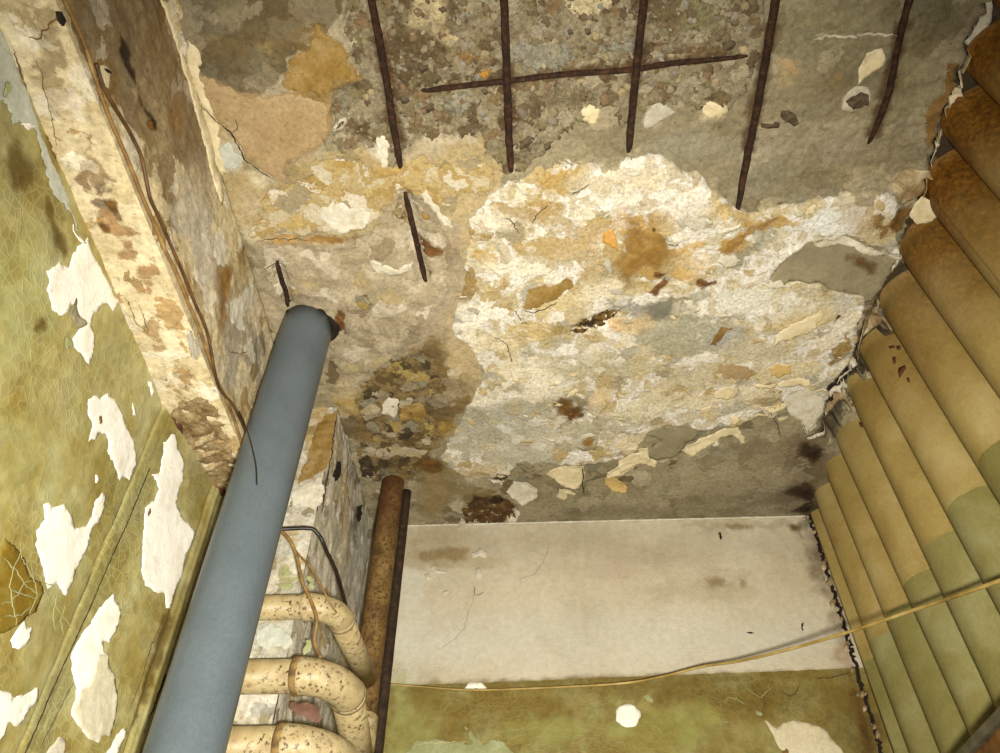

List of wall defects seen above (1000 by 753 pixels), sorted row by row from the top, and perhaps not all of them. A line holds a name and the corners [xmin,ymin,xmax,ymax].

crack [198,98,321,183]
rust [418,234,443,257]
peeling [248,0,993,523]
leakage [617,228,678,296]
peeling [88,393,137,480]
leakage [355,352,449,515]
leakage [800,443,822,462]
peeling [35,475,106,596]
peeling [141,397,236,608]
rust [461,495,515,523]
leakage [787,483,813,512]
peeling [71,594,127,753]